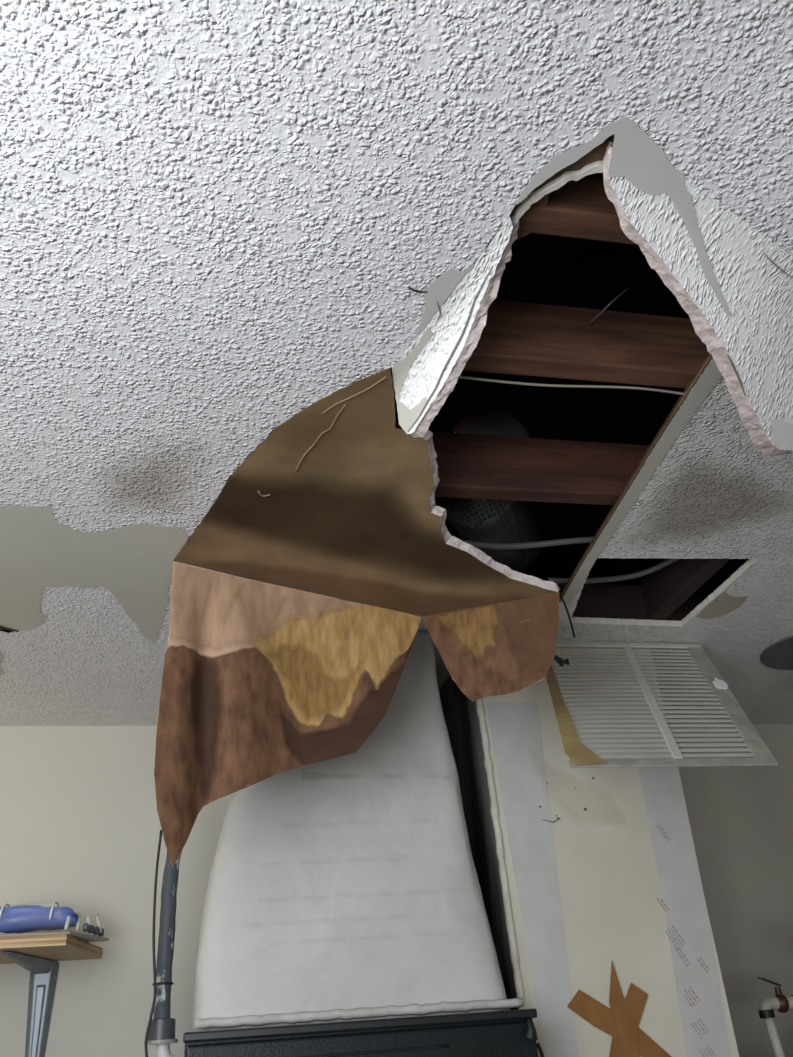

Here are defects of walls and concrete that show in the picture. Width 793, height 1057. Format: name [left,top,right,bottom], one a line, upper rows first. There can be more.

spalling [410,141,793,592]
damp [205,478,504,577]
damp [154,563,560,866]